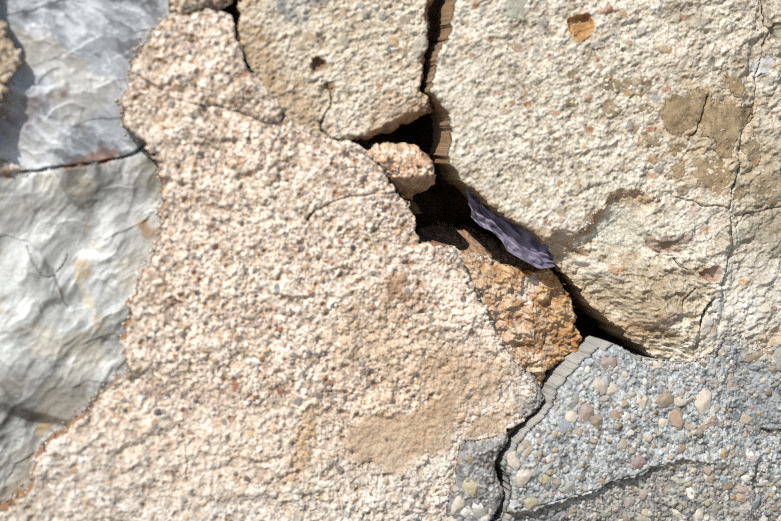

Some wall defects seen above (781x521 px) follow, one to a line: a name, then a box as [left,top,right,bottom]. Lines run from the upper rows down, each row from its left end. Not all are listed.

crack [427,0,441,47]
crack [675,0,779,273]
crack [306,85,504,245]
crack [572,302,629,351]
crack [682,288,723,328]